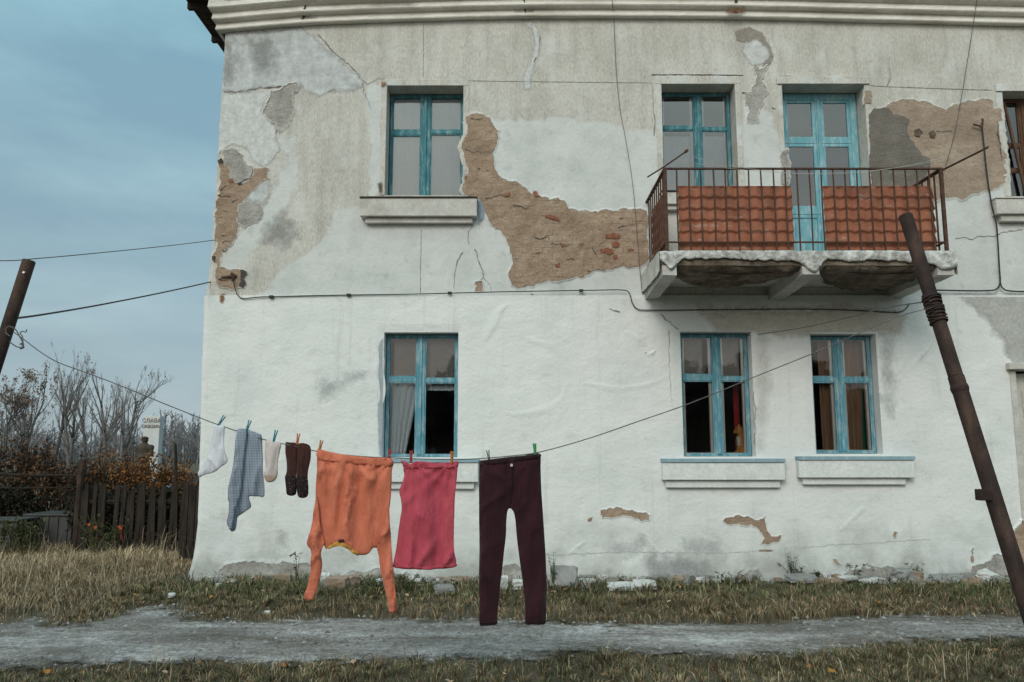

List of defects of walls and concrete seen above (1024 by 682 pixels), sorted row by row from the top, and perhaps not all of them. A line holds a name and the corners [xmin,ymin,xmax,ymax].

crack [301,5,385,102]
flaking render [735,27,773,125]
flaking render [261,81,301,134]
flaking render [862,90,1011,204]
flaking render [211,147,270,291]
flaking render [457,111,651,290]
flaking render [473,279,485,294]
spalling [676,266,799,287]
spalling [819,266,917,291]
flaking render [587,506,651,523]
flaking render [722,513,783,552]